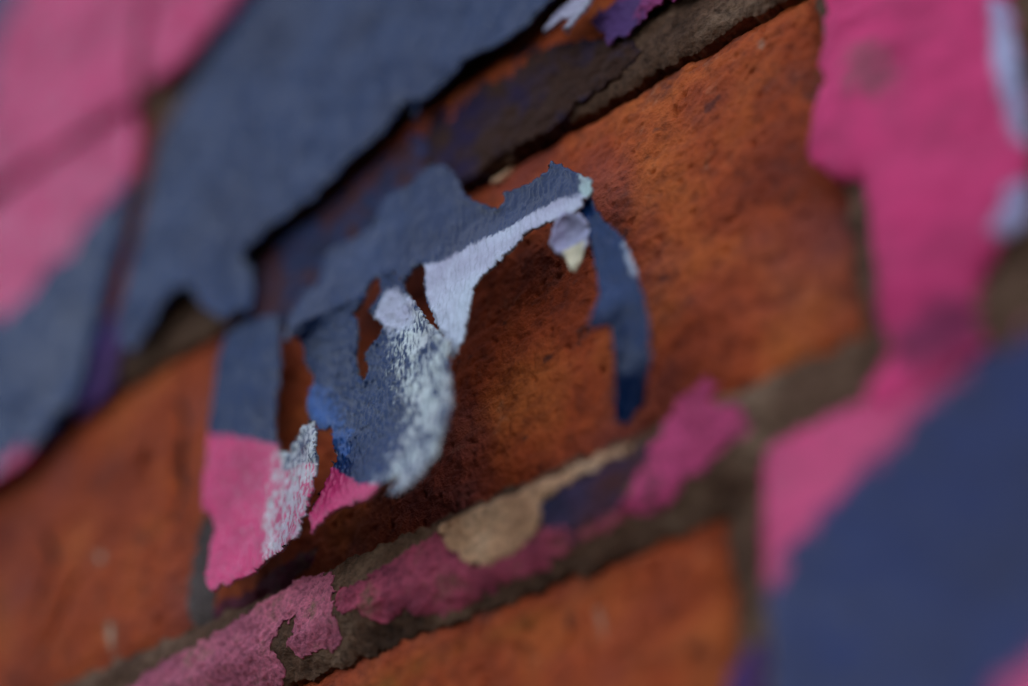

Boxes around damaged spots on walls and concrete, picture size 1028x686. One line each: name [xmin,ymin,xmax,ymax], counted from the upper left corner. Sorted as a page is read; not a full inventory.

peeling [201,0,677,593]